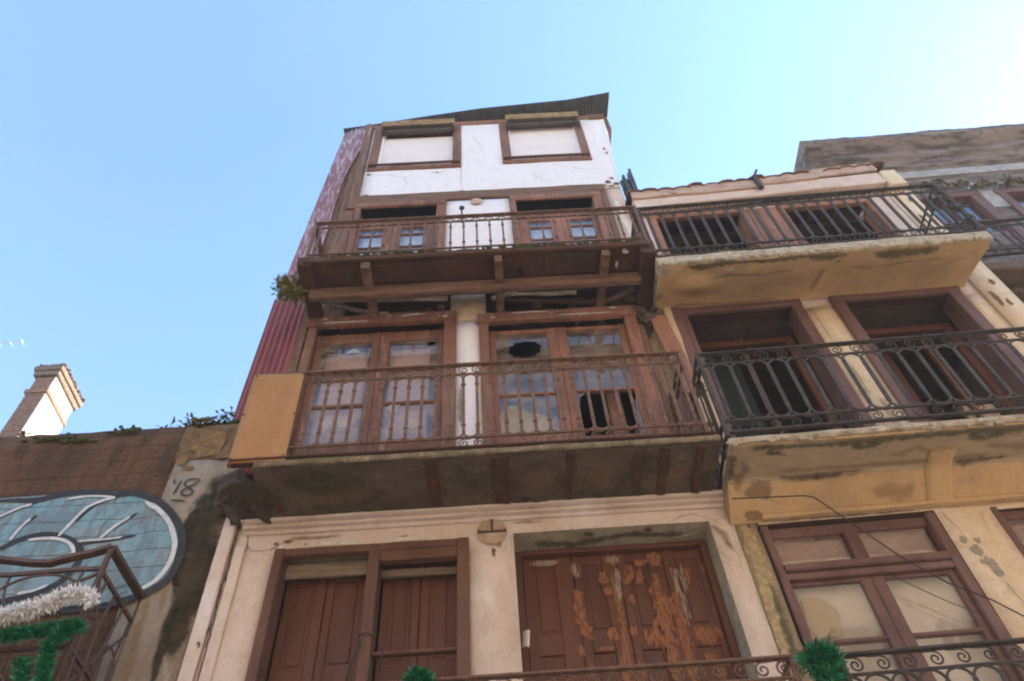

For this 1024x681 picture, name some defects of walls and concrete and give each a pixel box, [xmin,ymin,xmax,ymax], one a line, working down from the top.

damp [688,254,845,270]
damp [876,247,938,258]
damp [754,425,1024,456]
damp [782,470,859,480]
damp [287,476,406,516]
damp [516,488,675,503]
damp [151,473,232,681]
peeling [530,542,726,681]